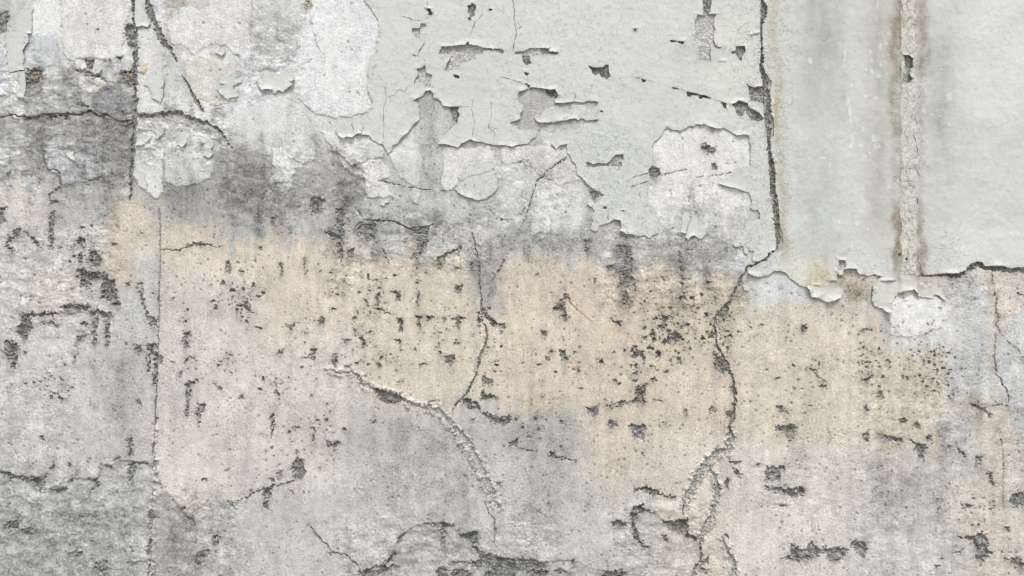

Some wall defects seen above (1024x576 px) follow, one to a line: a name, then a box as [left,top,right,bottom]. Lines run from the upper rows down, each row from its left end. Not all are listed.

crack [0,0,235,200]
crack [146,208,225,576]
peeling [256,70,295,93]
crack [325,157,567,541]
peeling [335,0,1024,462]
crack [631,169,732,187]
crack [681,0,781,576]
crack [917,253,1024,407]